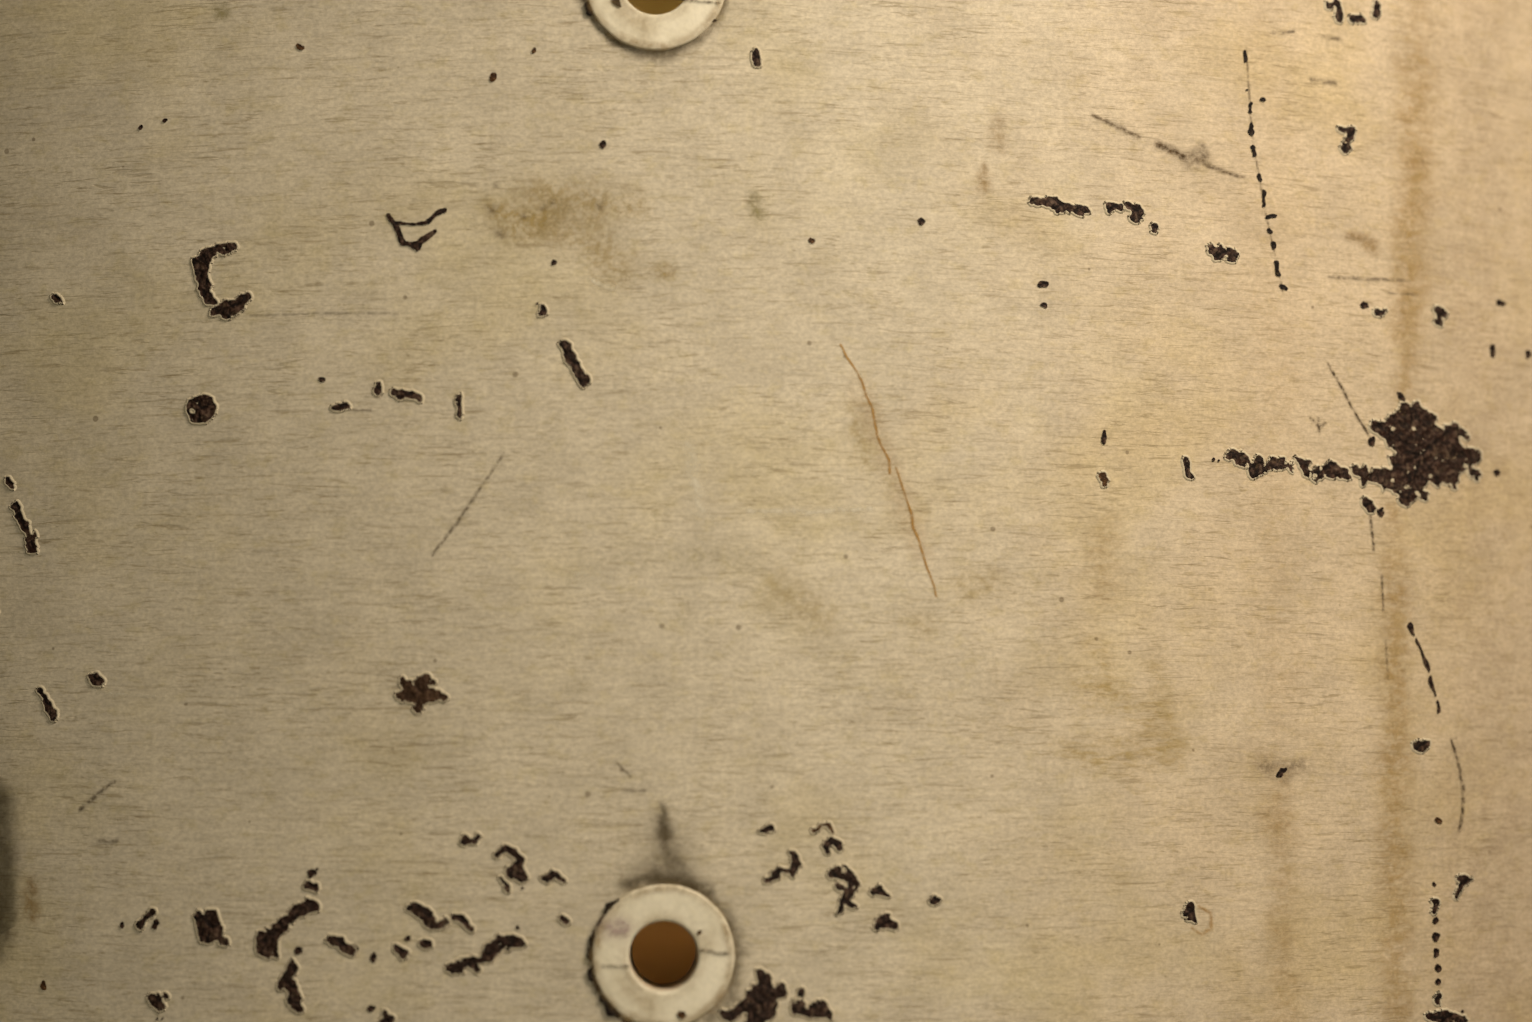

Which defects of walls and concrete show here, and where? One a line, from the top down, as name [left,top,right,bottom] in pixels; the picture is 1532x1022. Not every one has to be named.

rust [587,899,631,1022]